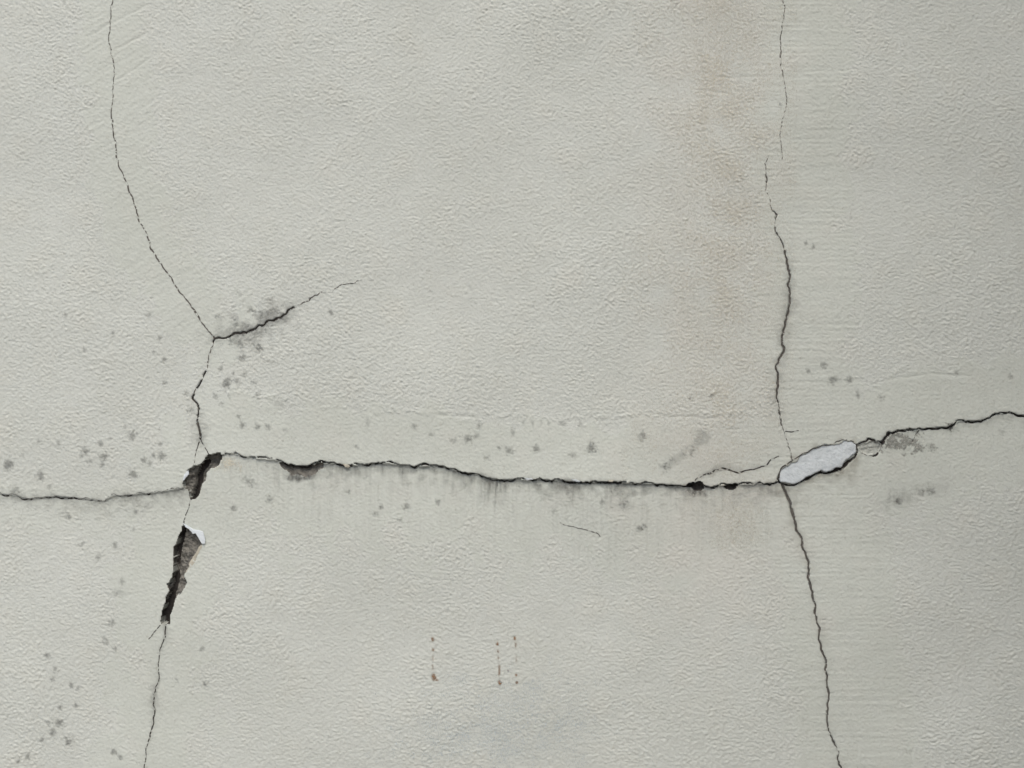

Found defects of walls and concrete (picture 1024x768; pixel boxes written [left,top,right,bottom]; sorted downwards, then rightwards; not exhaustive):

crack [108,0,842,768]
crack [881,411,1024,446]
spalling [182,452,244,499]
peeling [777,433,922,486]
crack [0,488,192,523]
spalling [160,523,205,625]